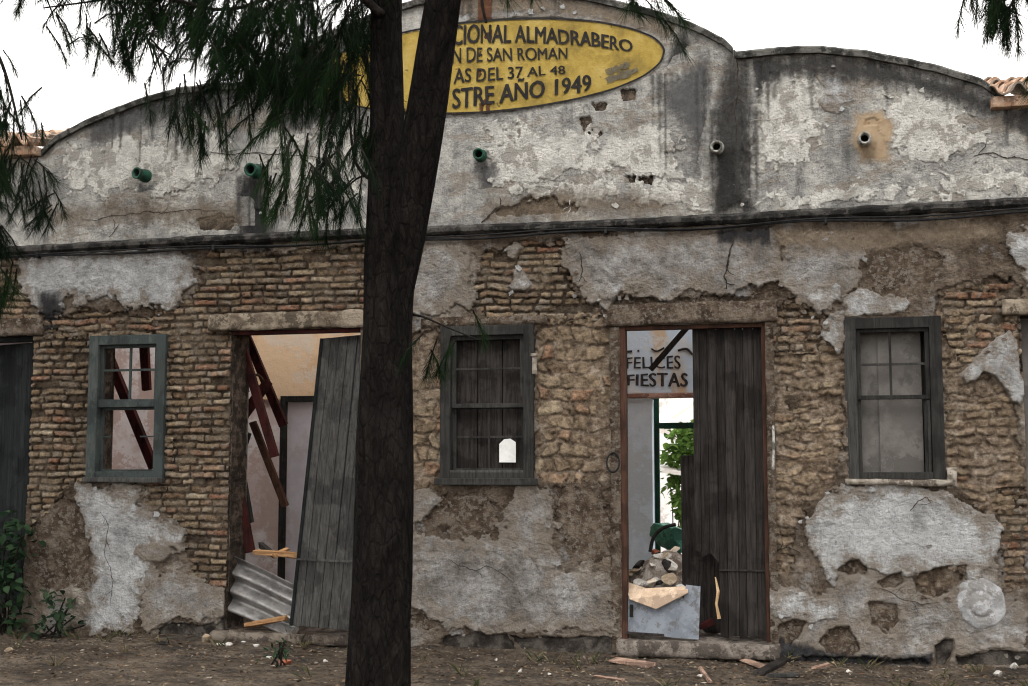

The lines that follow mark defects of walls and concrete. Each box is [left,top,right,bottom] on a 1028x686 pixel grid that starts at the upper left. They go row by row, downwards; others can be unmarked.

peeling [63,127,240,207]
damp [87,90,239,151]
damp [476,163,495,189]
damp [487,192,665,220]
peeling [483,102,718,217]
damp [491,0,990,214]
peeling [748,65,857,174]
peeling [740,85,1028,212]
crack [974,141,1028,160]
damp [1005,108,1028,139]
spalling [0,245,365,637]
peeling [411,224,1028,666]